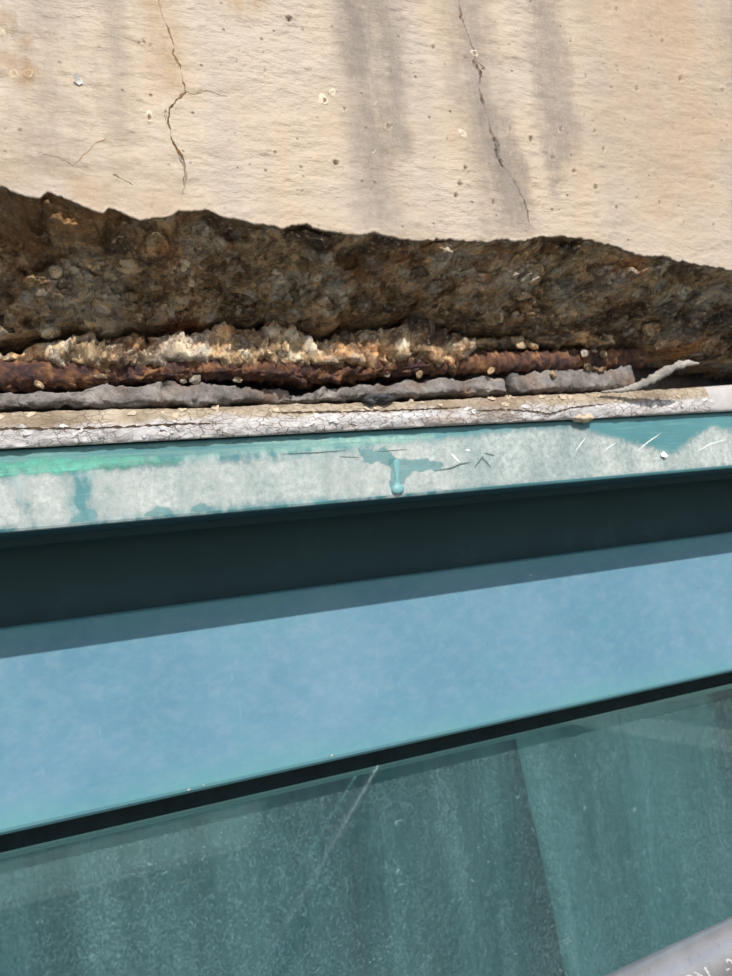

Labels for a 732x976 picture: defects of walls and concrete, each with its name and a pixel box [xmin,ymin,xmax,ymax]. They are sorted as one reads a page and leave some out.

crack [158,0,225,197]
crack [459,7,530,225]
spalling [0,187,732,528]